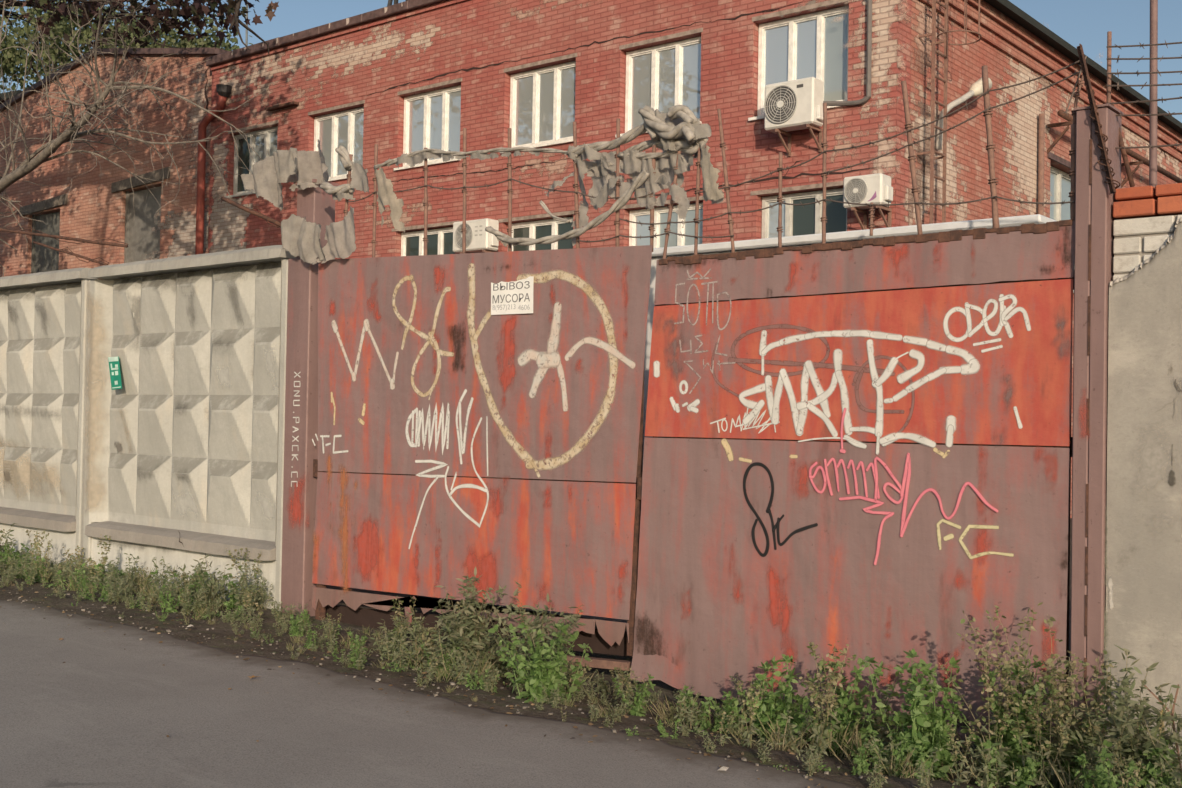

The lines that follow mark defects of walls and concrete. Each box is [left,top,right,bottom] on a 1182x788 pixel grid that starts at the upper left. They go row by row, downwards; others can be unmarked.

peeling [996,54,1090,216]
peeling [1122,126,1182,183]